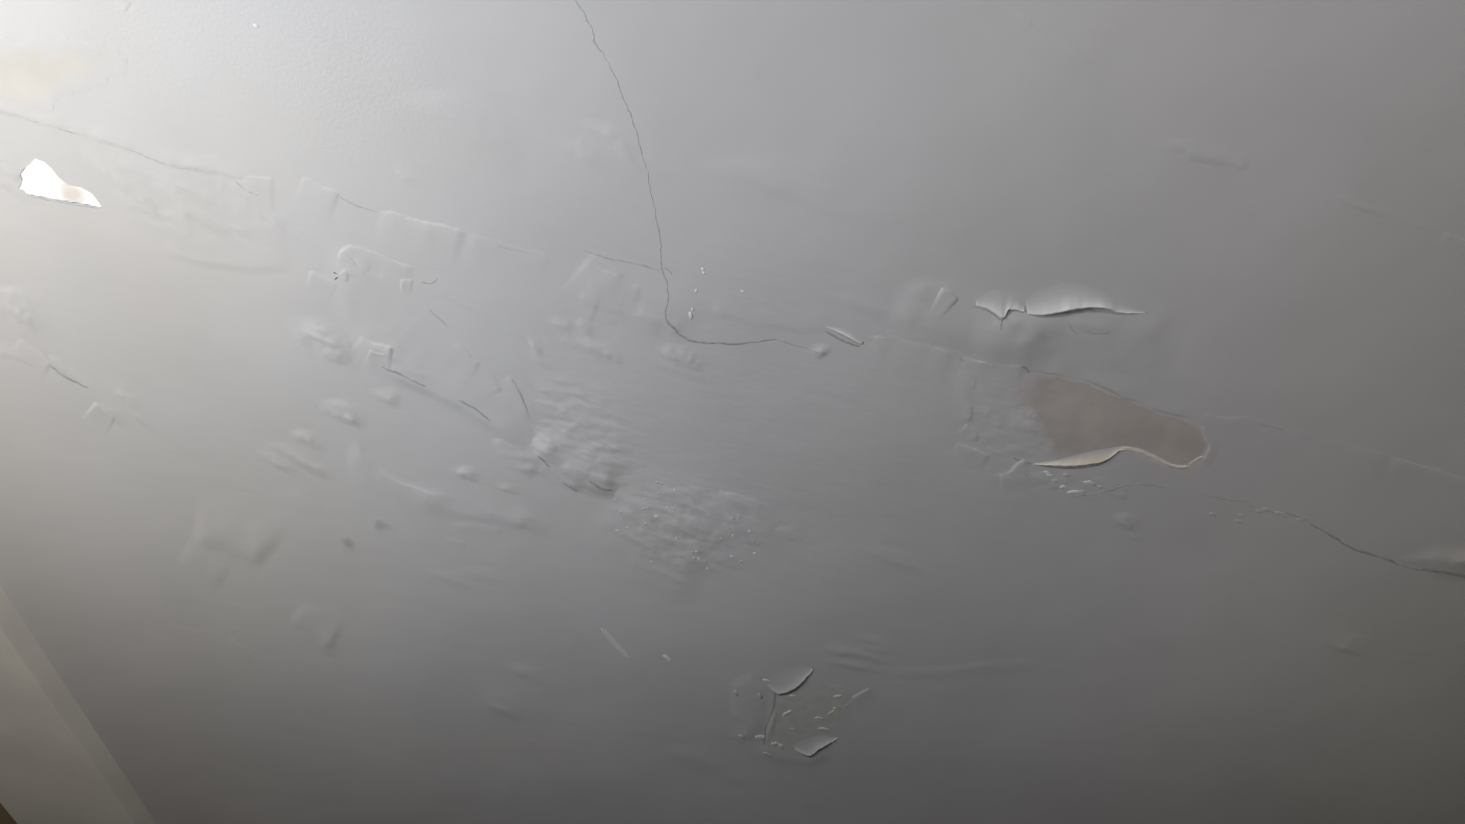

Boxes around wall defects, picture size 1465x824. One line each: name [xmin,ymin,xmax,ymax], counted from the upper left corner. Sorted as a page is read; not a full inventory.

peeling [18,159,102,209]
crack [575,0,817,353]
peeling [929,282,1147,334]
crack [1202,494,1445,573]